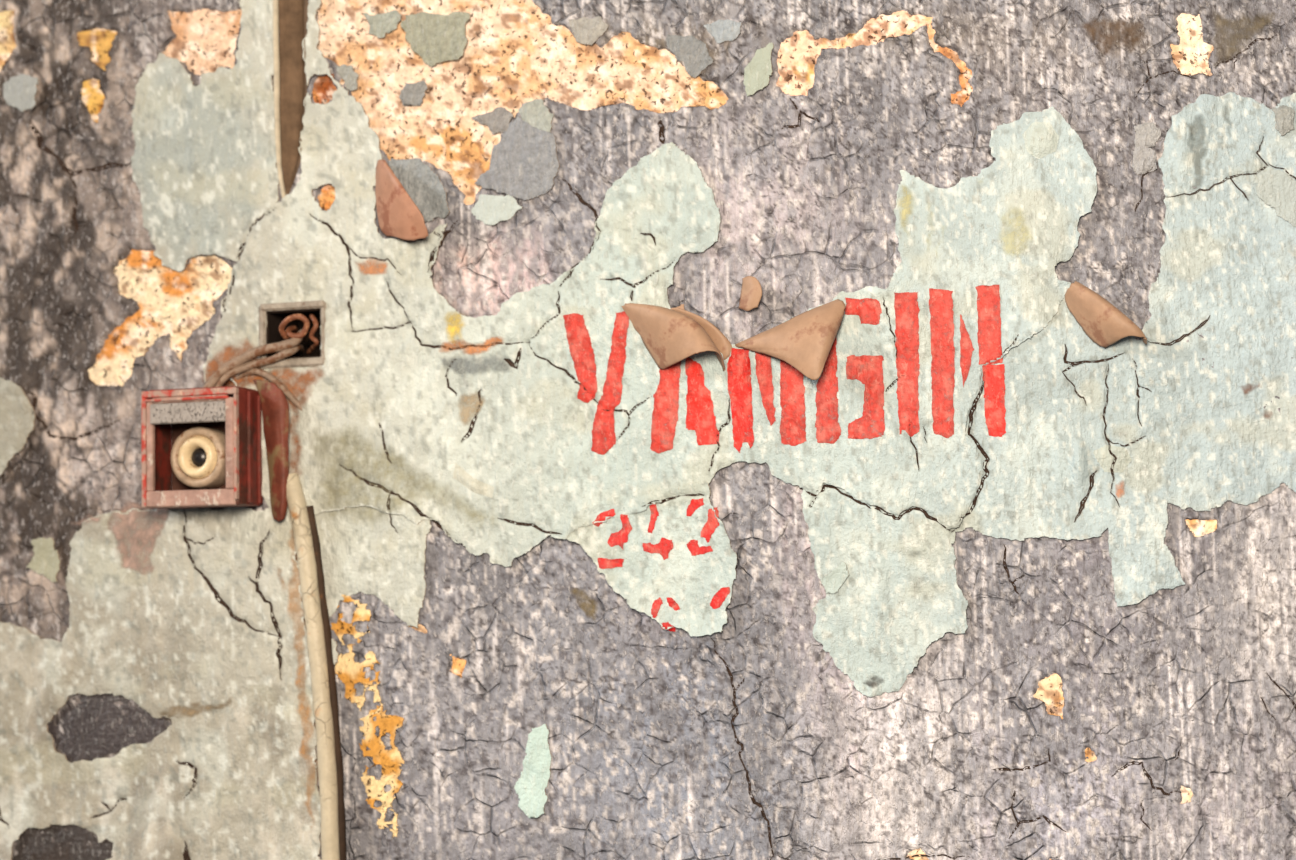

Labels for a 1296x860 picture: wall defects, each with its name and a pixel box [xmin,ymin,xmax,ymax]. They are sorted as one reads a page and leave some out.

peeling [87,0,1296,697]
peeling [0,378,36,476]
peeling [0,417,322,860]
crack [183,512,282,681]
crack [1003,545,1024,594]
flaking render [332,639,405,840]
peeling [514,724,552,818]
crack [711,638,789,860]
crack [992,748,1066,838]
flaking render [1034,674,1064,719]
crack [1112,750,1181,831]
crack [878,852,971,860]